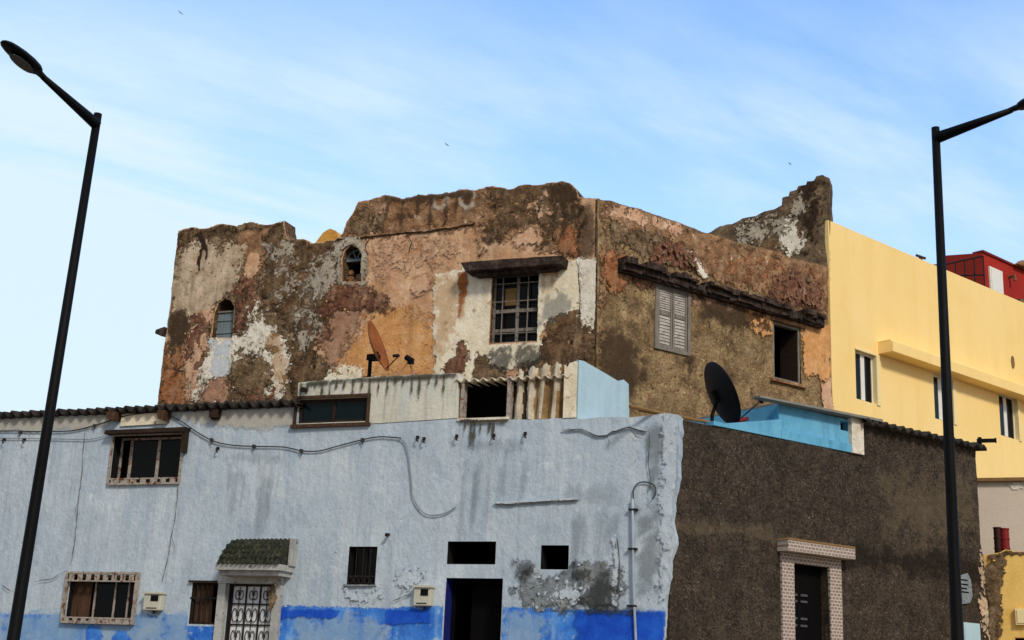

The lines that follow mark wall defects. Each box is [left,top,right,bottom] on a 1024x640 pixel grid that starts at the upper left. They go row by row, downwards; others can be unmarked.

flaking render [157,182,709,430]
flaking render [733,180,834,409]
flaking render [502,534,628,640]